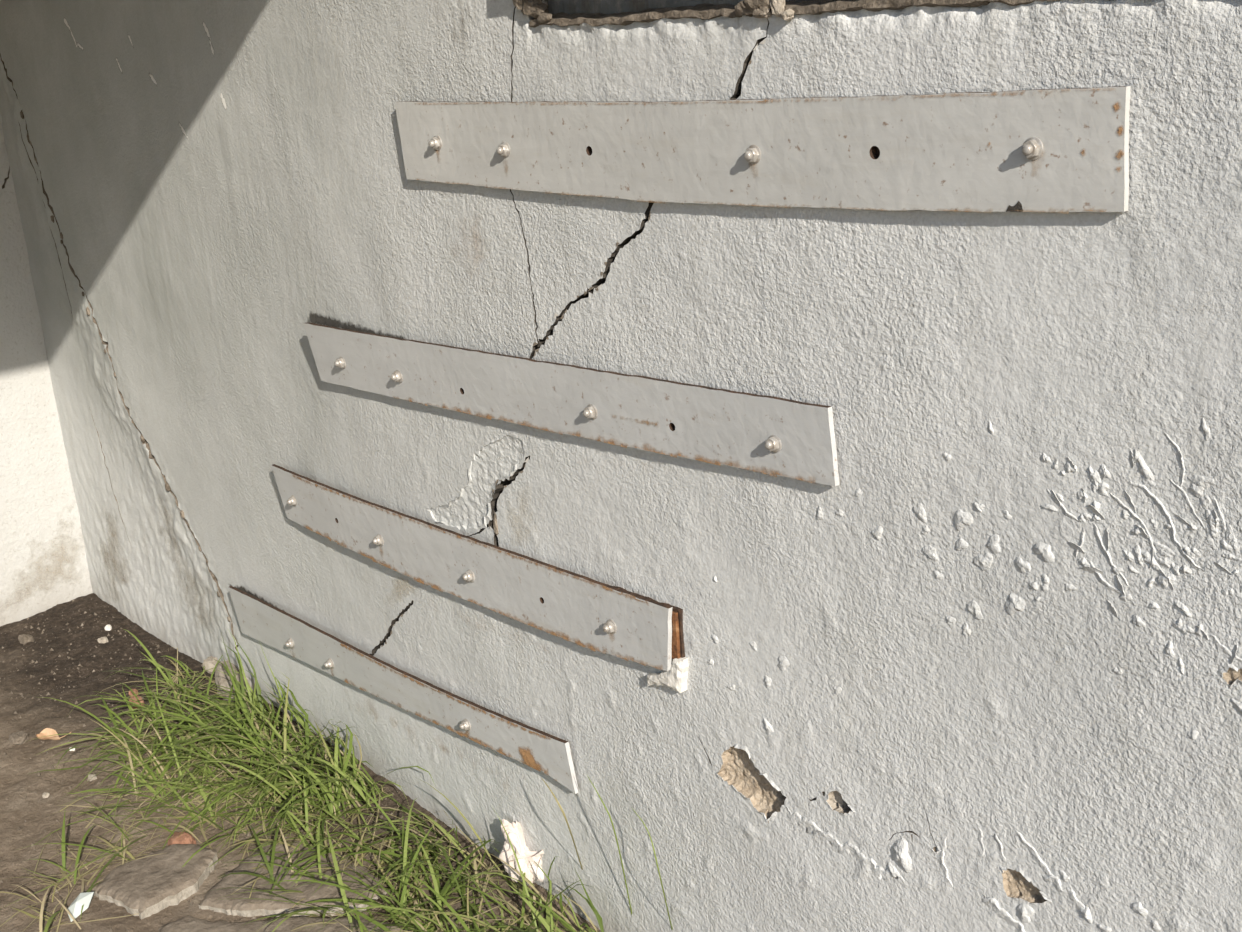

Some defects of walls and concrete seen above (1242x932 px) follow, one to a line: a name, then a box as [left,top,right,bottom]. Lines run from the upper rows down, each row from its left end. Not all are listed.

crack [730,18,769,100]
crack [510,189,655,359]
peeling [427,435,524,530]
crack [470,456,530,547]
corrosion [596,439,732,466]
crack [370,600,413,656]
corrosion [359,553,600,652]
corrosion [340,643,550,739]
corrosion [399,705,546,774]
spalling [716,743,787,823]
spalling [809,791,857,817]
spalling [1000,866,1053,907]